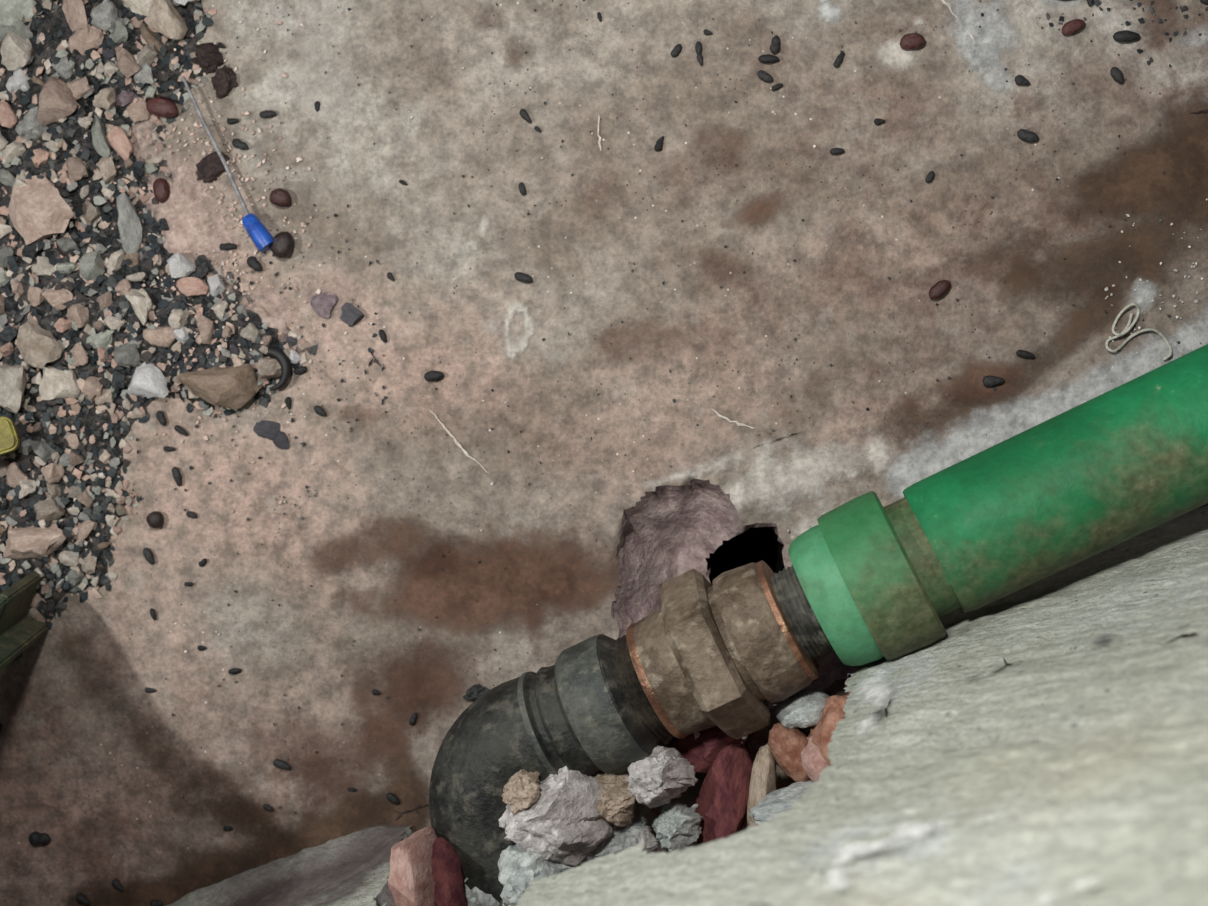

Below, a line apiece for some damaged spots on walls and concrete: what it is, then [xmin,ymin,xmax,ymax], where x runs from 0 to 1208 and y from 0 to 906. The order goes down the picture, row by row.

damp [955,0,1014,90]
damp [987,96,1208,357]
damp [887,312,1208,498]
spalling [611,440,891,638]
spalling [806,651,890,730]
spalling [374,876,396,906]